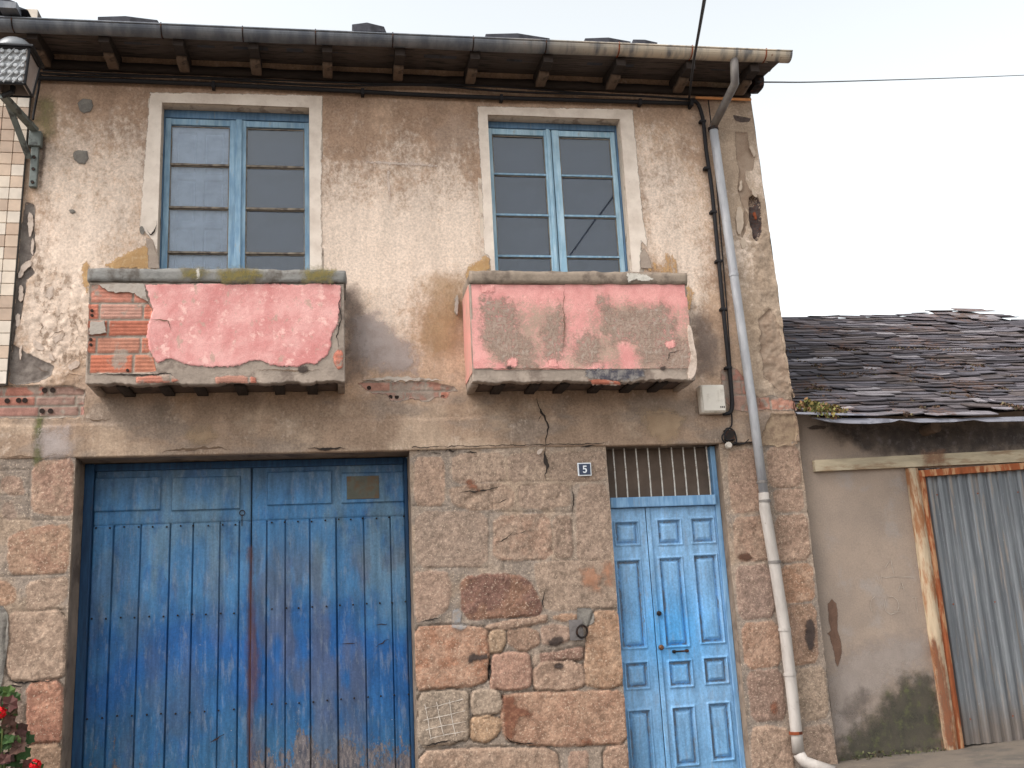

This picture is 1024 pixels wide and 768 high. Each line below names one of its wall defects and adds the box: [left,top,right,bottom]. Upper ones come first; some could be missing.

peeling [733,115,762,249]
peeling [648,253,677,273]
spalling [0,202,178,419]
spalling [215,375,256,384]
spalling [333,350,343,369]
spalling [358,376,457,402]
peeling [479,295,698,386]
crack [412,401,602,479]
leakage [830,640,944,761]
corrosion [931,640,957,749]